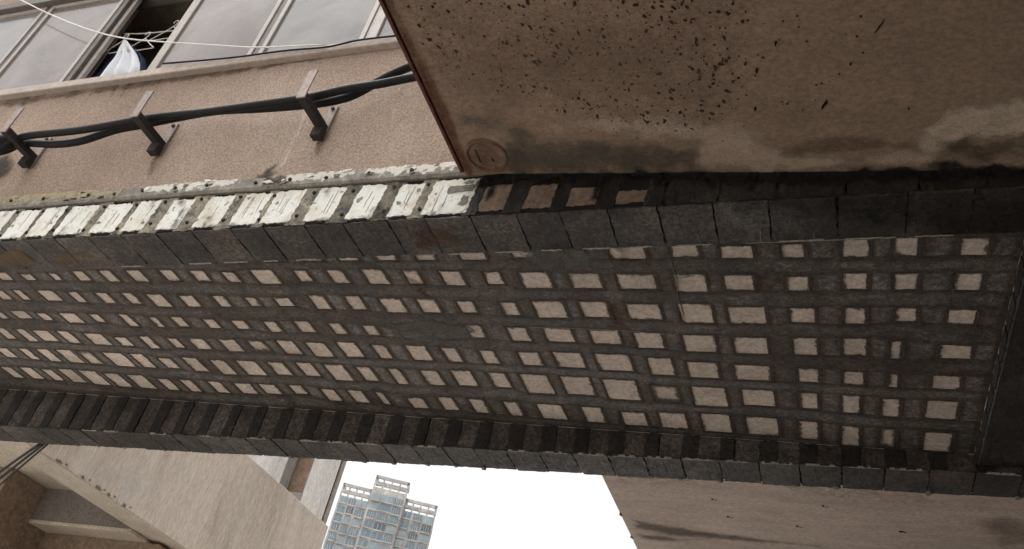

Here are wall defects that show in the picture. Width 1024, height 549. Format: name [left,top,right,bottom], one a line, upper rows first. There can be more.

leakage [407,0,1024,199]
peeling [0,161,512,239]